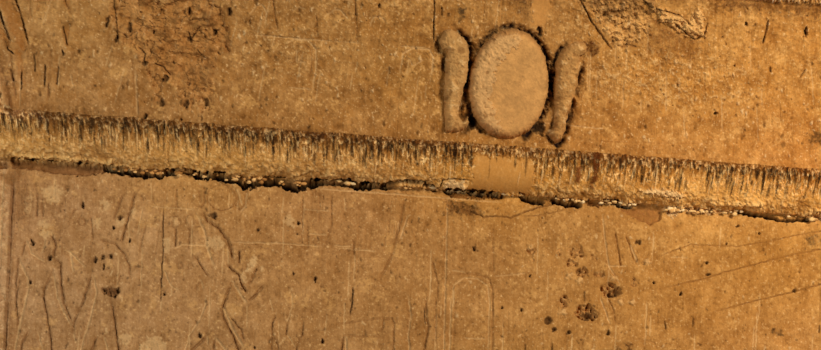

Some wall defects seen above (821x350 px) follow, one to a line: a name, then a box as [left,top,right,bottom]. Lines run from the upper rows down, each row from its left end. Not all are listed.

spalling [587,0,709,48]
spalling [105,0,234,121]
spalling [566,247,622,300]
spalling [559,296,600,322]